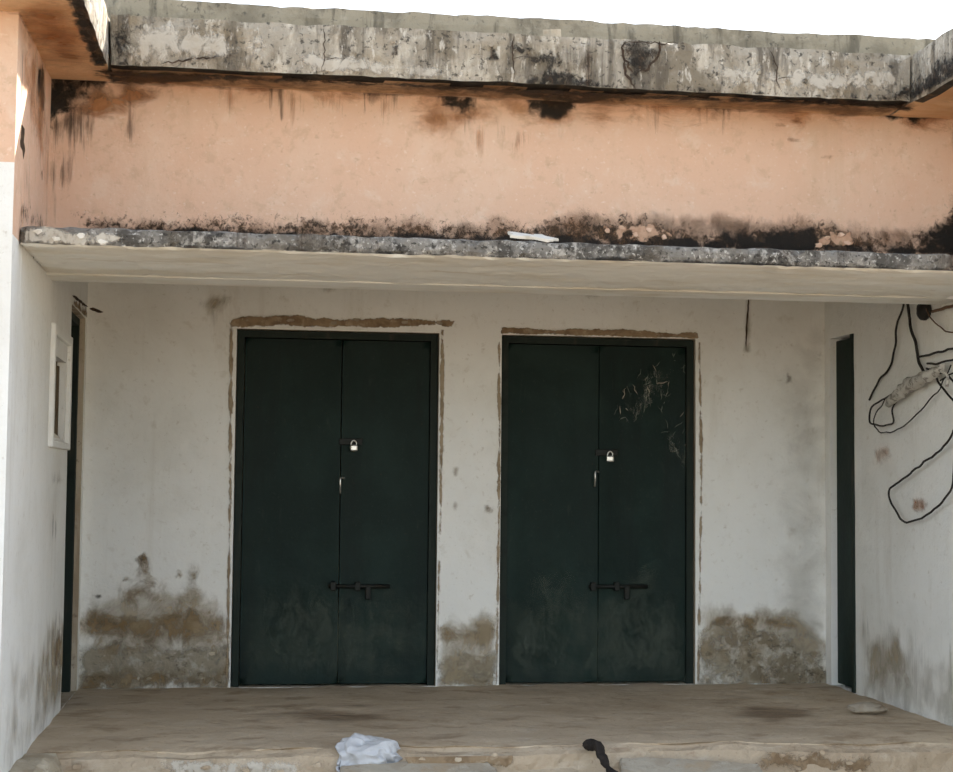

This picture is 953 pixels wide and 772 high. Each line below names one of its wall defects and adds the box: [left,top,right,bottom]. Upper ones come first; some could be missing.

water stain [38,0,953,137]
water stain [81,215,953,271]
water stain [42,636,62,710]
water stain [81,579,229,689]
water stain [439,618,496,686]
water stain [700,614,827,684]